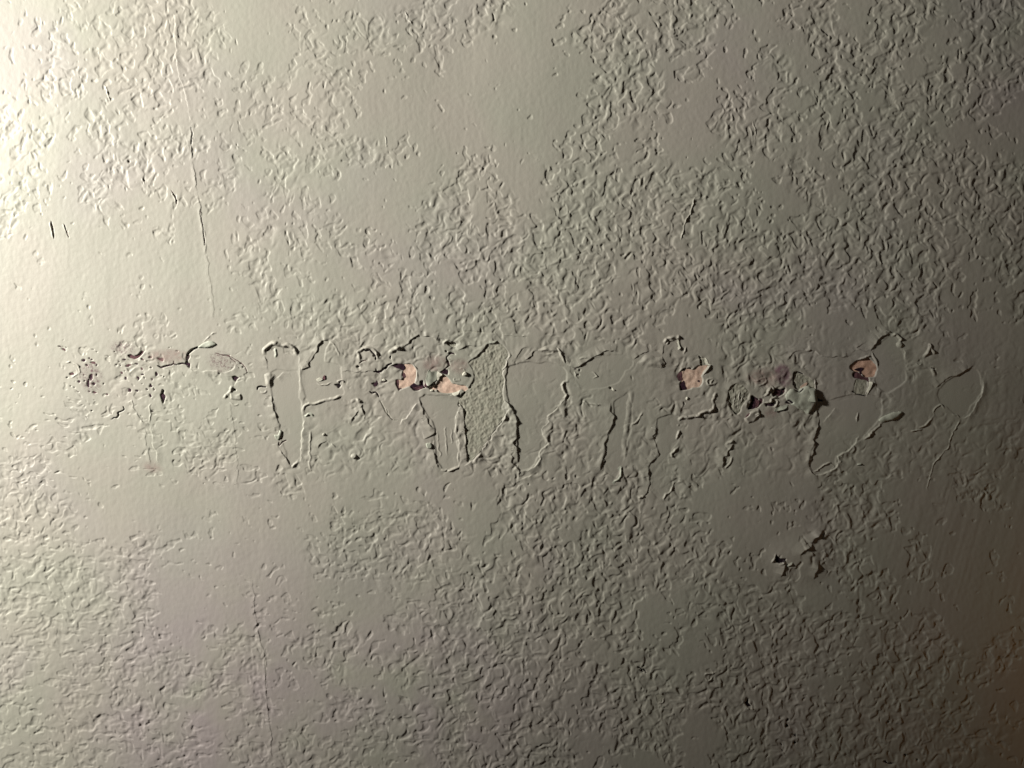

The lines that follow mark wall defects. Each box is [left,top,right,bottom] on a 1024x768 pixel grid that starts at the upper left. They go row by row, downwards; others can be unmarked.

crack [158,14,247,378]
peeling [260,333,344,395]
peeling [372,328,468,399]
peeling [580,389,615,470]
peeling [659,335,687,355]
peeling [677,356,711,390]
peeling [744,372,823,424]
peeling [850,328,937,396]